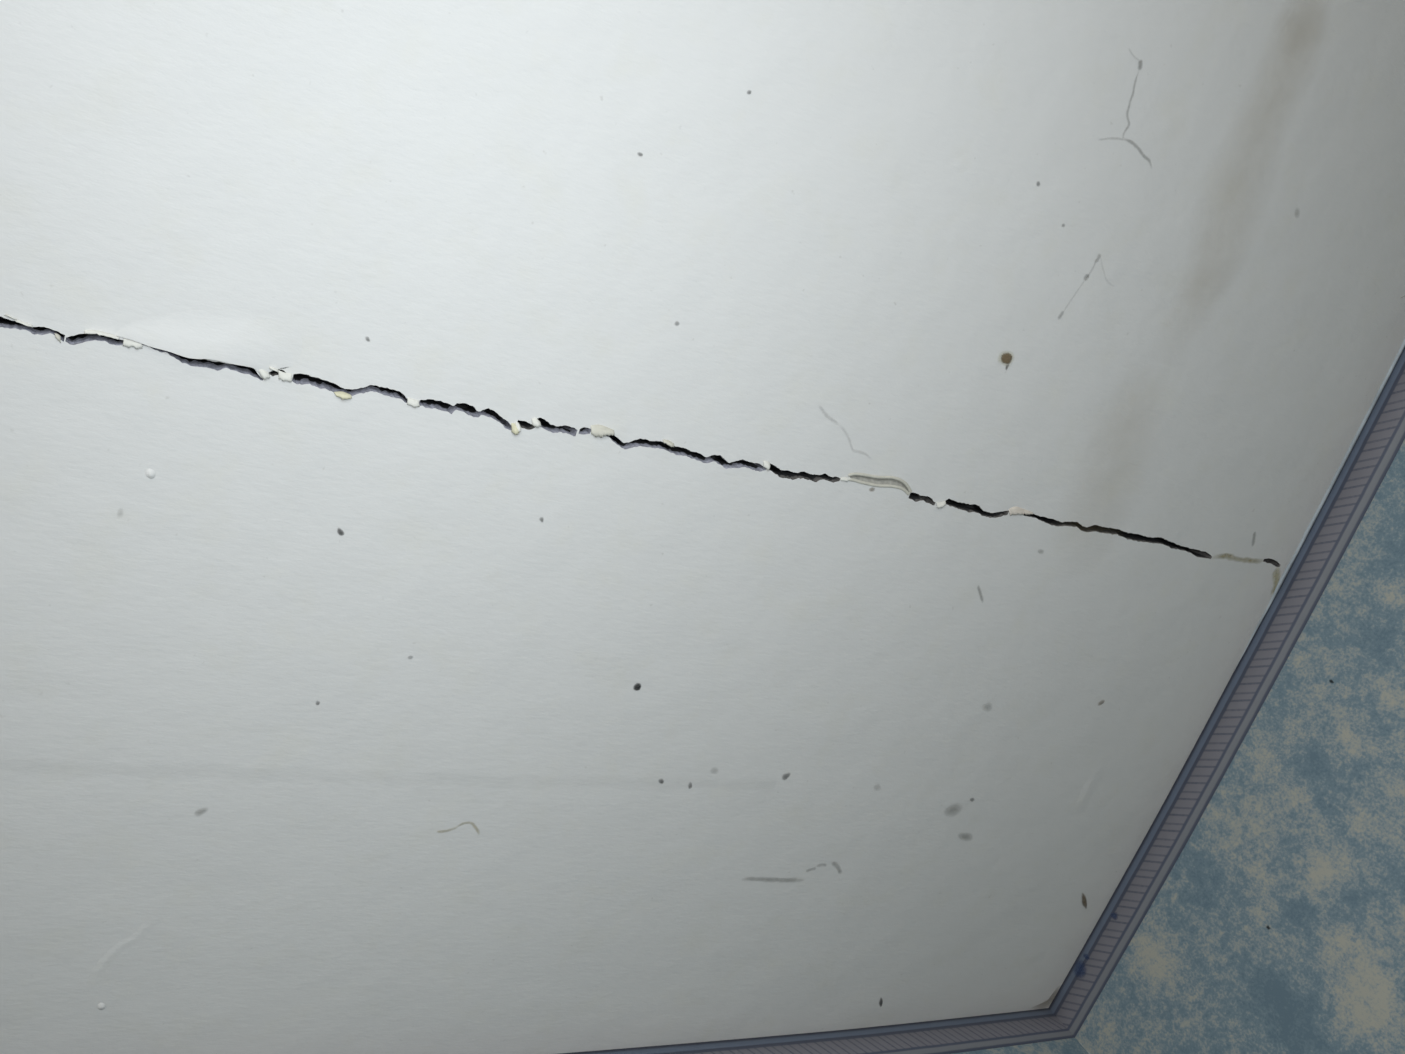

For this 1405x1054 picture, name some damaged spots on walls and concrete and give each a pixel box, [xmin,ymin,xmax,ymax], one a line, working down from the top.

crack [0,314,1280,591]